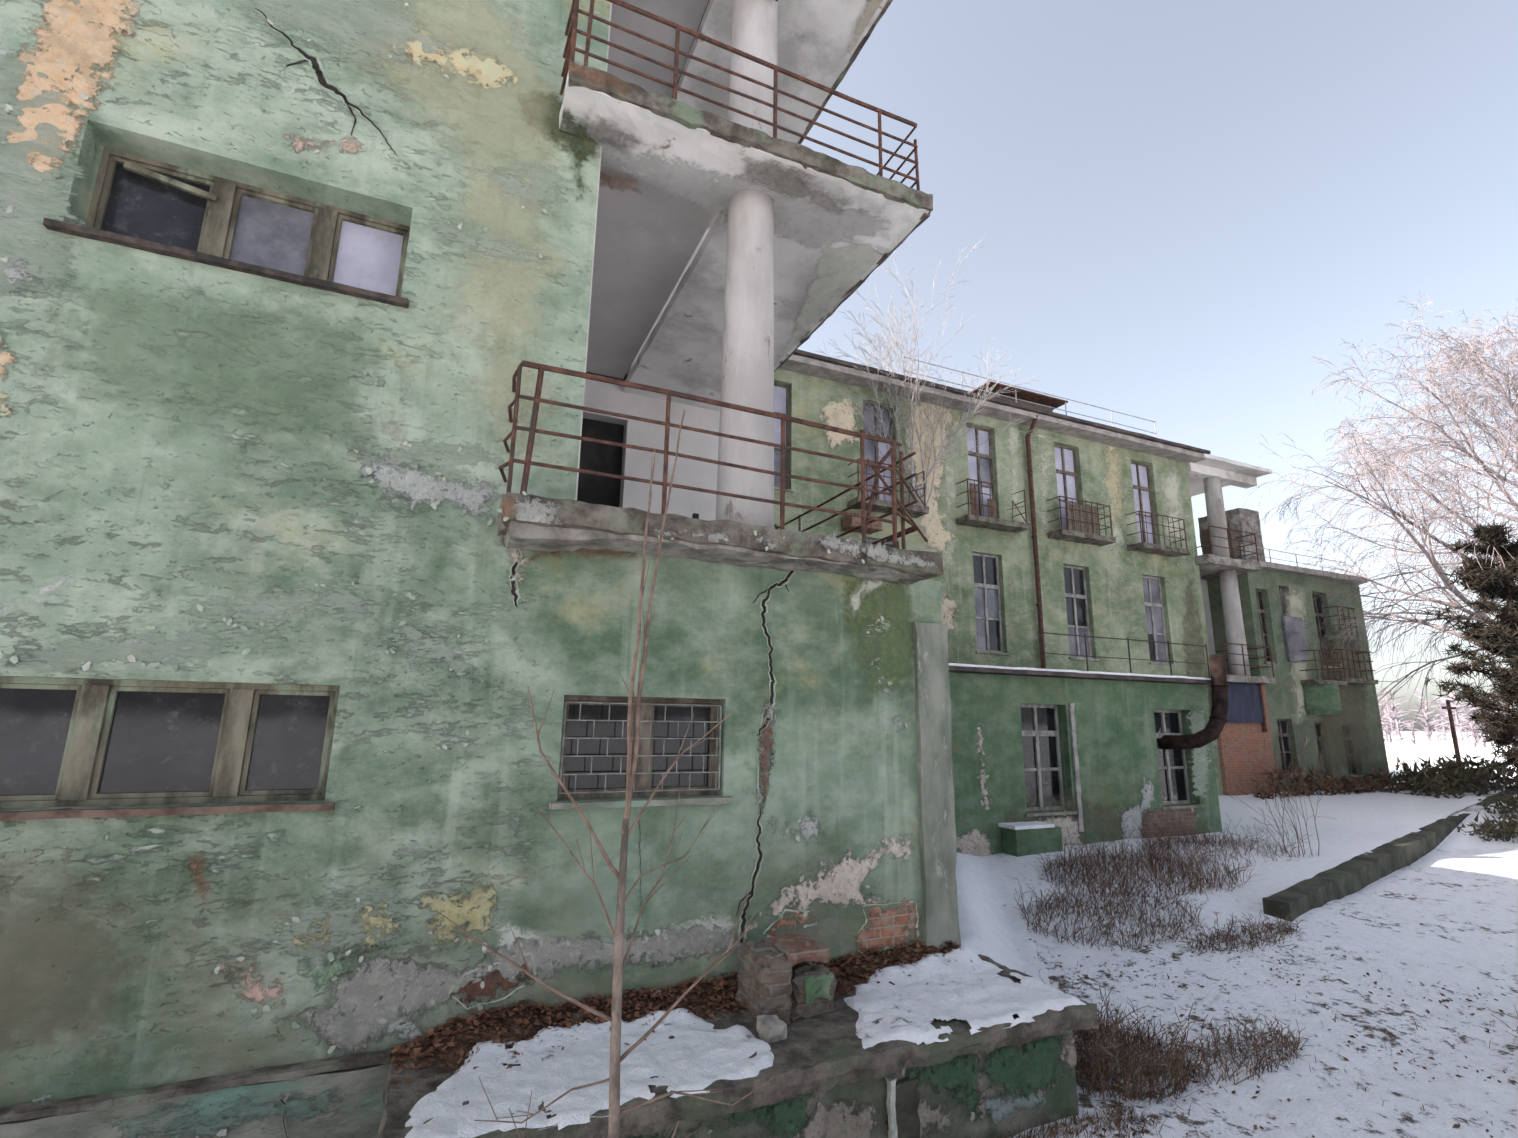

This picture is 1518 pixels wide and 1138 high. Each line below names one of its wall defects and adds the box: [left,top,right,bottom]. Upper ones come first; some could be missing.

crack [251,0,398,156]
peeling [0,0,147,297]
peeling [803,398,959,568]
corrosion [532,548,636,560]
crack [753,571,796,736]
crack [735,808,763,943]
flaking render [956,828,995,856]
peeling [976,724,992,811]
peeling [1119,777,1156,839]
peeling [1186,706,1212,803]
flaking render [214,833,922,1055]
flaking render [629,1092,879,1138]